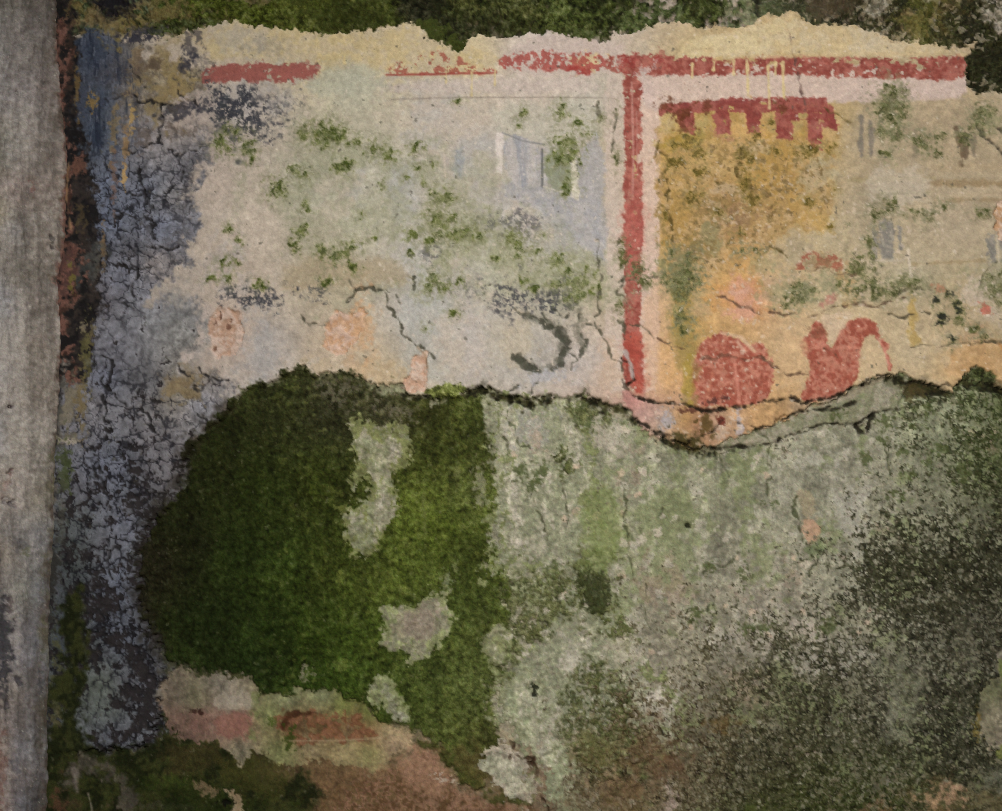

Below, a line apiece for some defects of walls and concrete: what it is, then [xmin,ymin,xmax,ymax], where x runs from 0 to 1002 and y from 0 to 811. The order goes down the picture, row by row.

flaking render [979,0,1002,36]
crack [977,126,1002,155]
crack [841,289,932,321]
crack [46,20,230,756]
spalling [463,387,553,411]
spalling [575,394,638,426]
crack [510,256,892,476]
spalling [661,376,1002,459]
crack [876,373,952,388]
crack [502,422,531,482]
spalling [976,649,1002,752]
spalling [224,789,244,811]